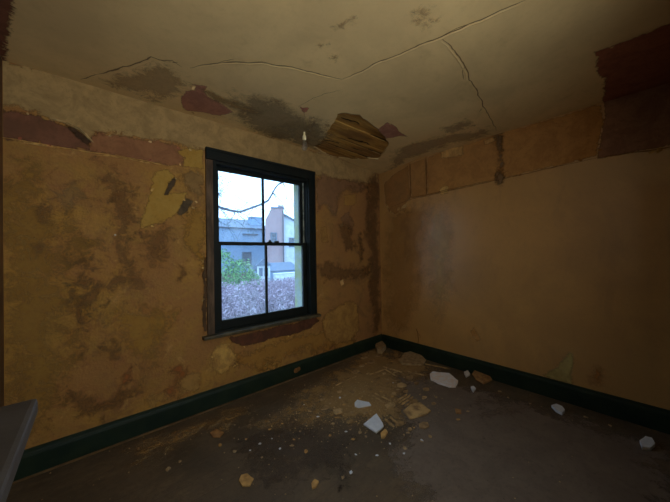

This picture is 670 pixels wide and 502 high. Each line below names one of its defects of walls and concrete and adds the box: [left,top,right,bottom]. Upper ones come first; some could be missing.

peeling [0,0,405,229]
damp [232,96,329,147]
crack [83,0,529,128]
peeling [595,24,670,102]
damp [68,171,144,325]
damp [318,175,381,332]
flaking render [230,317,319,348]